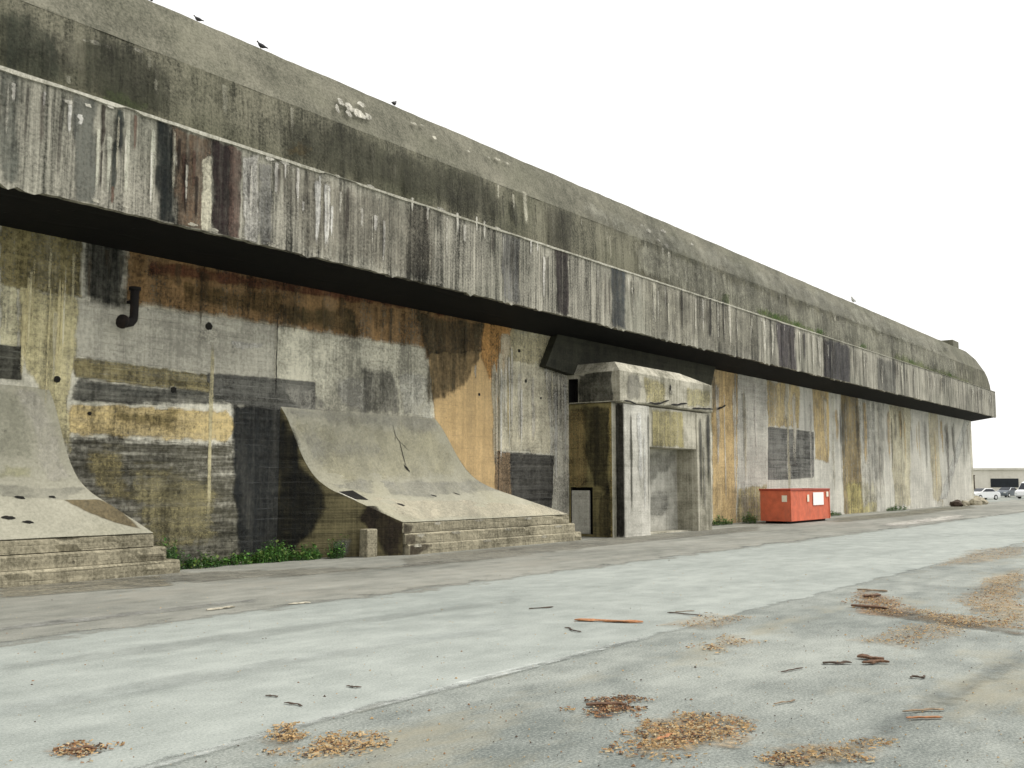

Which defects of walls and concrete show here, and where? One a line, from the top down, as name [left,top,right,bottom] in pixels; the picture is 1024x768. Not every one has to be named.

water stain [0,12,212,232]
corrosion [173,126,242,238]
spalling [335,98,371,120]
water stain [0,243,356,566]
corrosion [127,252,512,494]
water stain [338,310,484,418]
water stain [491,329,668,537]
water stain [586,229,992,521]